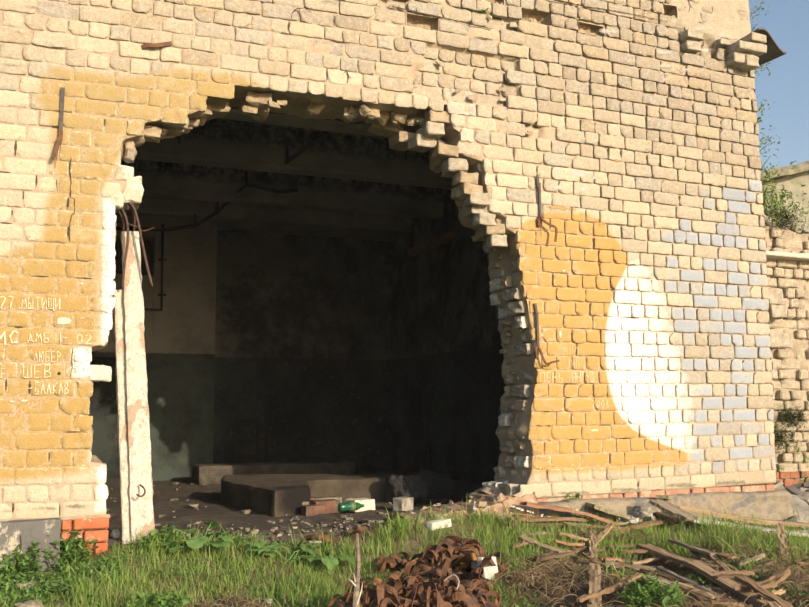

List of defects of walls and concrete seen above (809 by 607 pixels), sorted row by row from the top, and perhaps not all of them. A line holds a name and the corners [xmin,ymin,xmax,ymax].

spalling [376,0,440,32]
spalling [470,6,552,31]
spalling [577,18,607,38]
spalling [663,2,677,18]
spalling [665,28,684,56]
spalling [695,40,712,58]
spalling [413,48,516,106]
spalling [144,90,287,143]
spalling [306,101,326,115]
spalling [123,140,137,163]
spalling [116,202,153,287]
spalling [343,103,538,495]